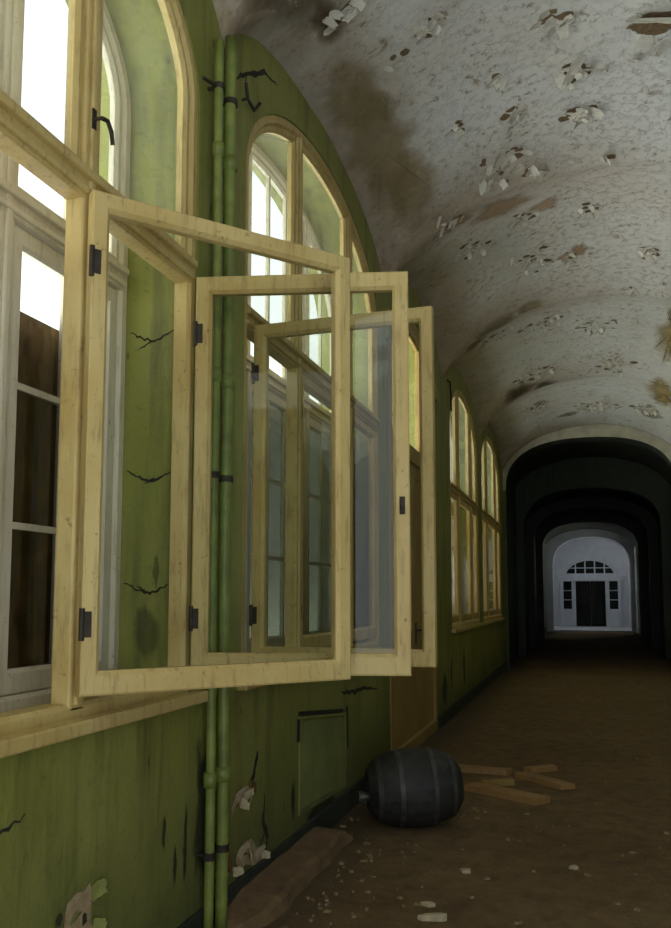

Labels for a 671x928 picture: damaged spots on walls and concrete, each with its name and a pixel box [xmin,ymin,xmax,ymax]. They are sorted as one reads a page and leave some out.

peeling [322,0,369,36]
peeling [528,9,576,40]
peeling [624,11,671,64]
crack [236,69,278,86]
peeling [554,52,608,91]
peeling [558,105,605,129]
peeling [477,147,549,196]
crack [130,330,174,350]
crack [127,471,171,485]
crack [123,583,168,595]
crack [0,813,25,835]
peeling [56,878,108,928]